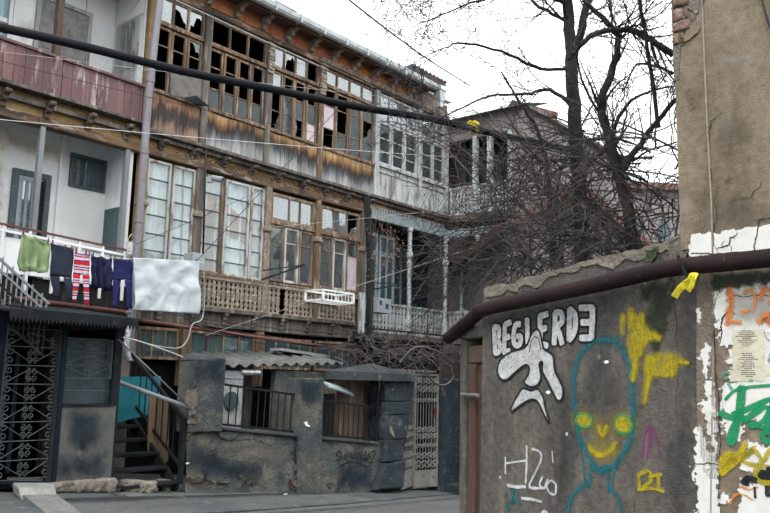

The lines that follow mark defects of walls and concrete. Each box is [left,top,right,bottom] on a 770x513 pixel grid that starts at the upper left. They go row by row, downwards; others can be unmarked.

peeling [668,224,770,259]
crack [691,167,770,255]
water stain [72,415,96,449]
peeling [689,282,770,513]
crack [694,276,770,513]